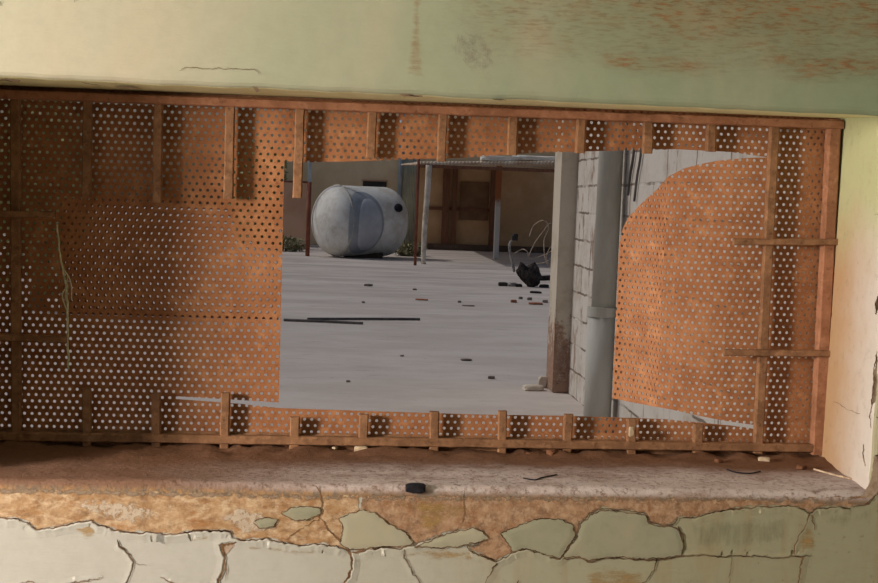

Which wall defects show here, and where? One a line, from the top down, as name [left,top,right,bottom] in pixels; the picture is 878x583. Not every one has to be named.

crack [2,534,239,583]
crack [287,485,420,583]
peeling [0,455,878,568]
crack [485,563,519,583]
crack [563,514,815,583]